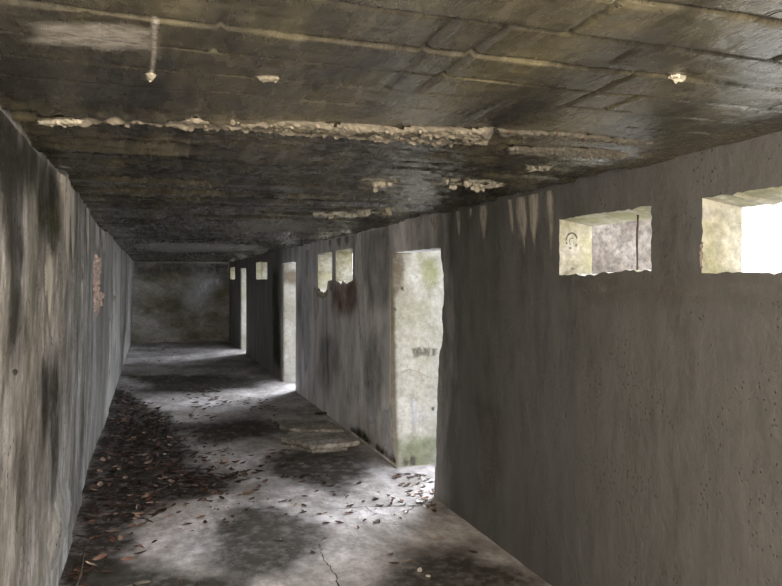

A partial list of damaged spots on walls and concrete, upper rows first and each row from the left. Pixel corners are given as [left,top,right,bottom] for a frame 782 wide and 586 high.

spalling [93,252,104,316]